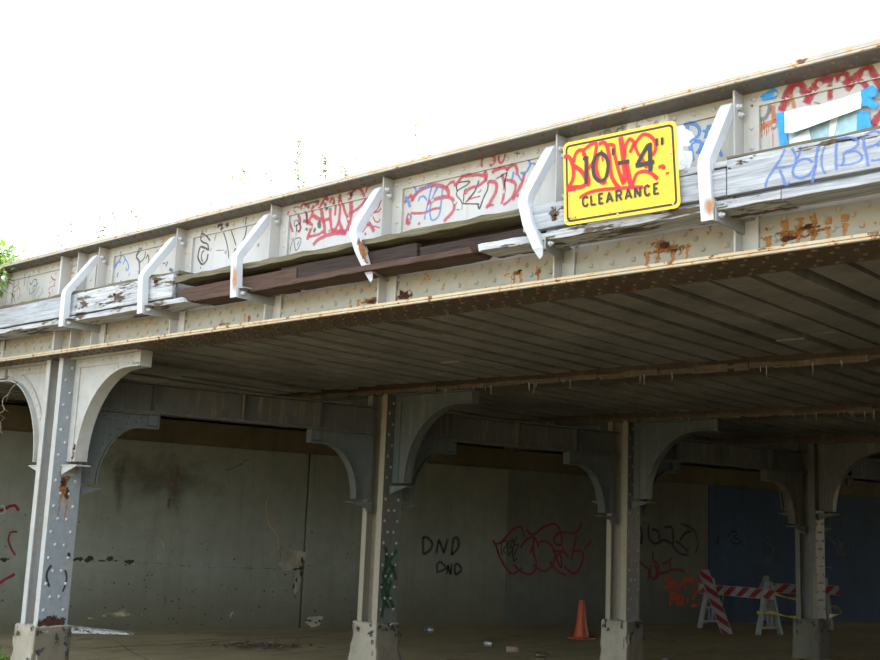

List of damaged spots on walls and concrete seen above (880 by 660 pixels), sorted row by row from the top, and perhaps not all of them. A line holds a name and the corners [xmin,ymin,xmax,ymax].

corrosion [761,214,849,247]
corrosion [644,239,690,265]
corrosion [57,476,70,521]